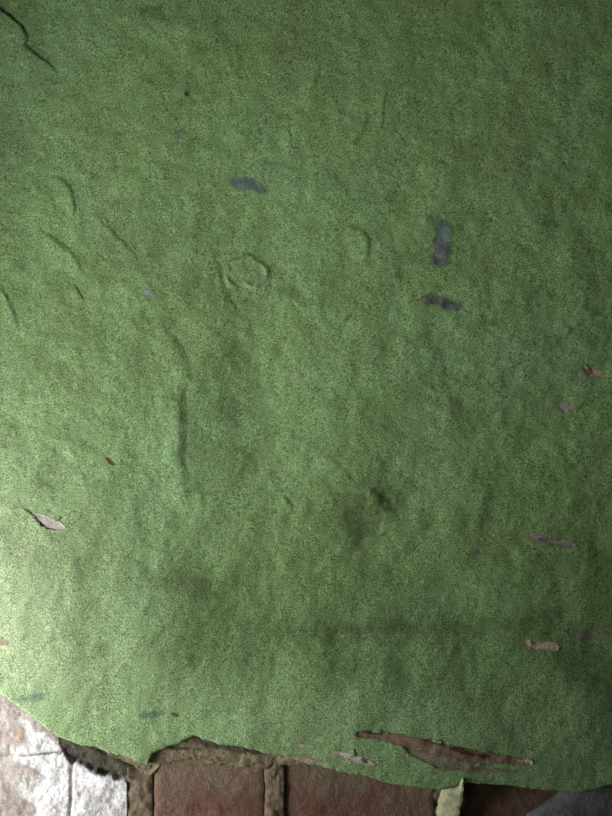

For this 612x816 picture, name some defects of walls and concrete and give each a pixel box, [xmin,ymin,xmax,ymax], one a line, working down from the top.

crack [0,7,27,35]
leakage [430,216,452,266]
leakage [420,293,459,311]
peeling [29,513,66,531]
peeling [524,639,559,651]
flaking render [0,694,441,816]
flaking render [356,730,533,770]
flaking render [460,783,559,816]